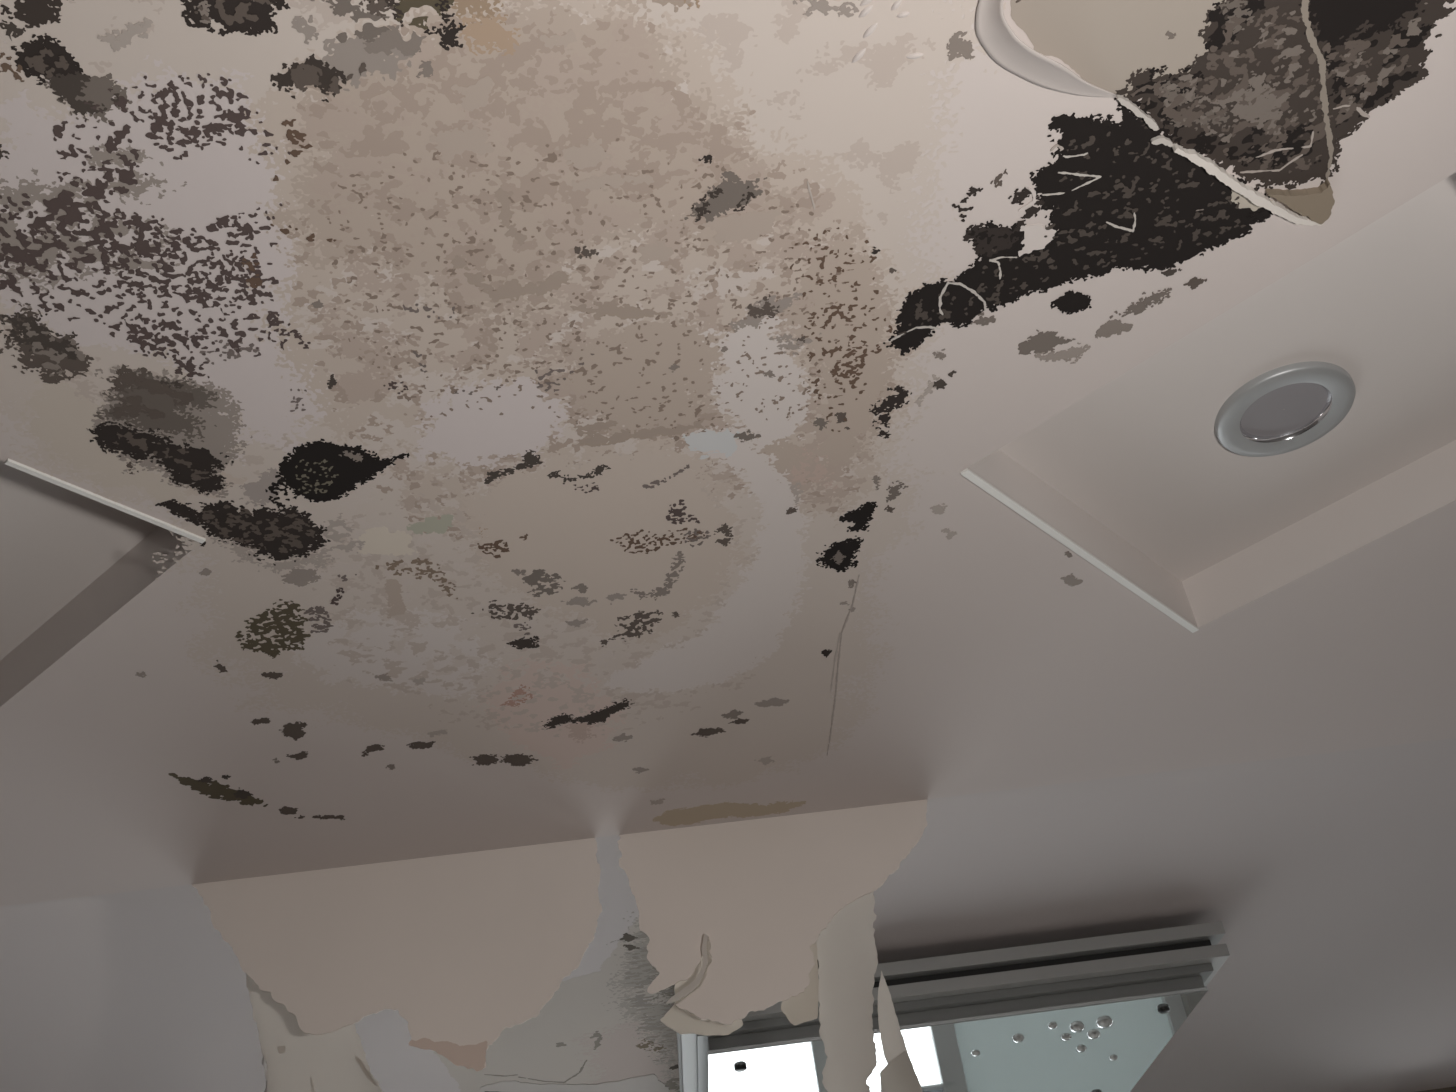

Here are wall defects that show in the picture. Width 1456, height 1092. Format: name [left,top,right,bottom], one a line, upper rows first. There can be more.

flaking render [1018,224,1056,257]
flaking render [1231,190,1273,211]
water stain [0,0,1456,827]
flaking render [434,918,680,1092]